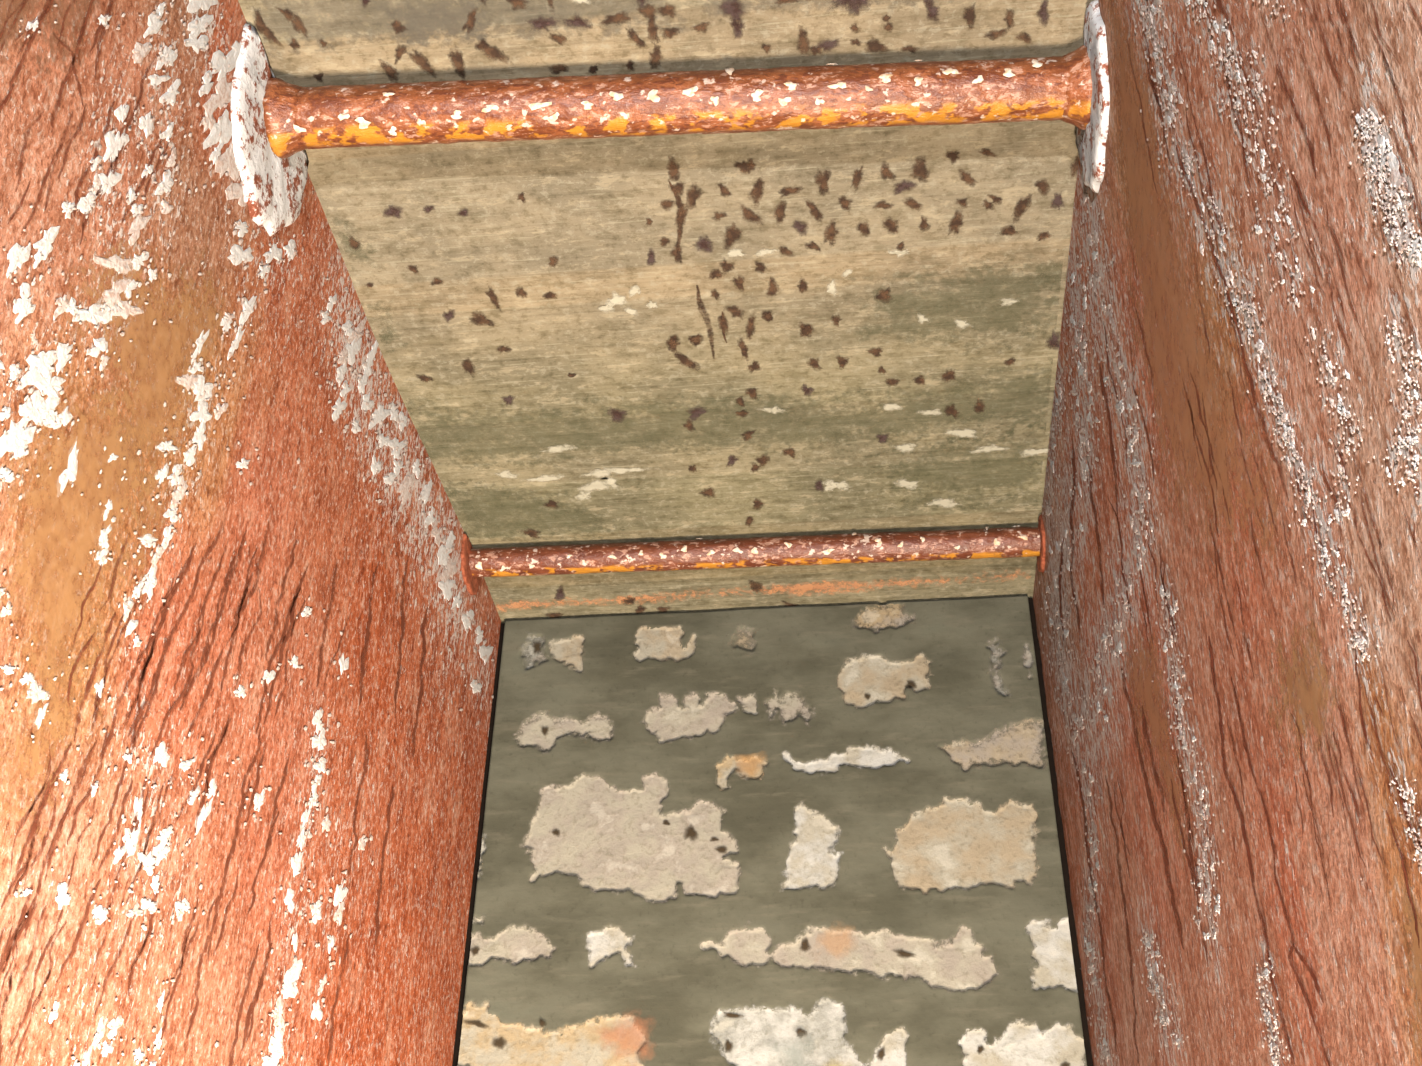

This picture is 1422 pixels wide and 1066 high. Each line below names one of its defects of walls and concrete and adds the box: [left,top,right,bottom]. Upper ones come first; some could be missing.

rust [73,54,157,245]
rust [1216,0,1370,352]
rust [1304,0,1422,229]
rust [1127,26,1336,596]
rust [1058,307,1176,663]
rust [0,242,308,1066]
spalling [958,192,1225,1066]
spalling [458,1001,647,1066]
spalling [522,744,910,903]
spalling [709,998,909,1066]
spalling [700,925,999,992]
spalling [883,796,1041,895]